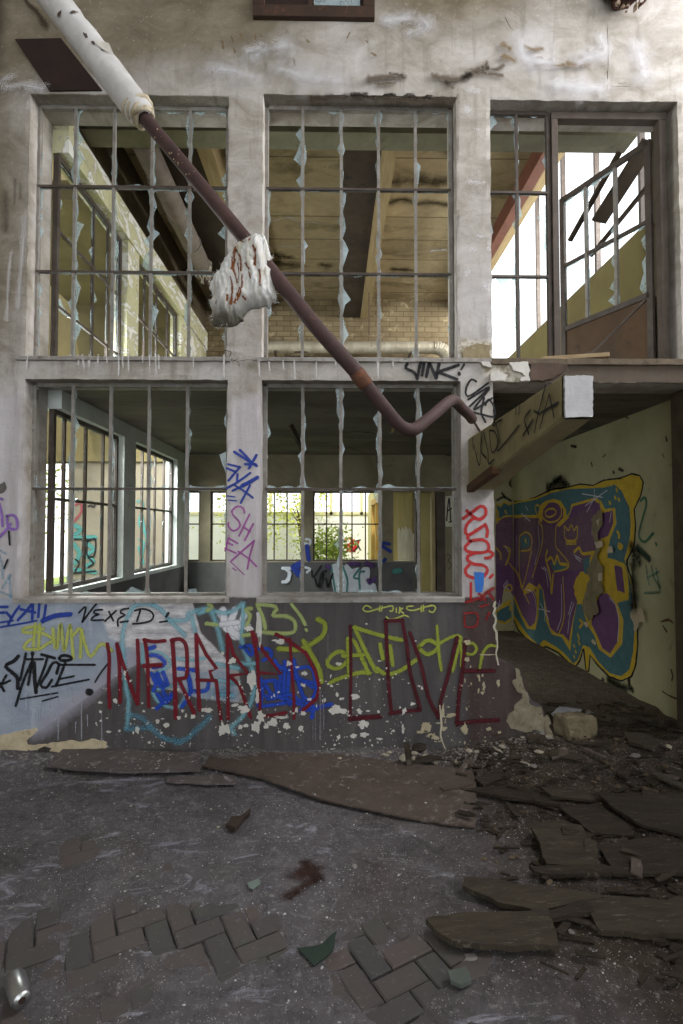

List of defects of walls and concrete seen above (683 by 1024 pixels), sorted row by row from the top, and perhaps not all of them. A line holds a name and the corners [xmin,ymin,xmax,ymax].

peeling [462,343,530,382]
spalling [0,601,554,753]